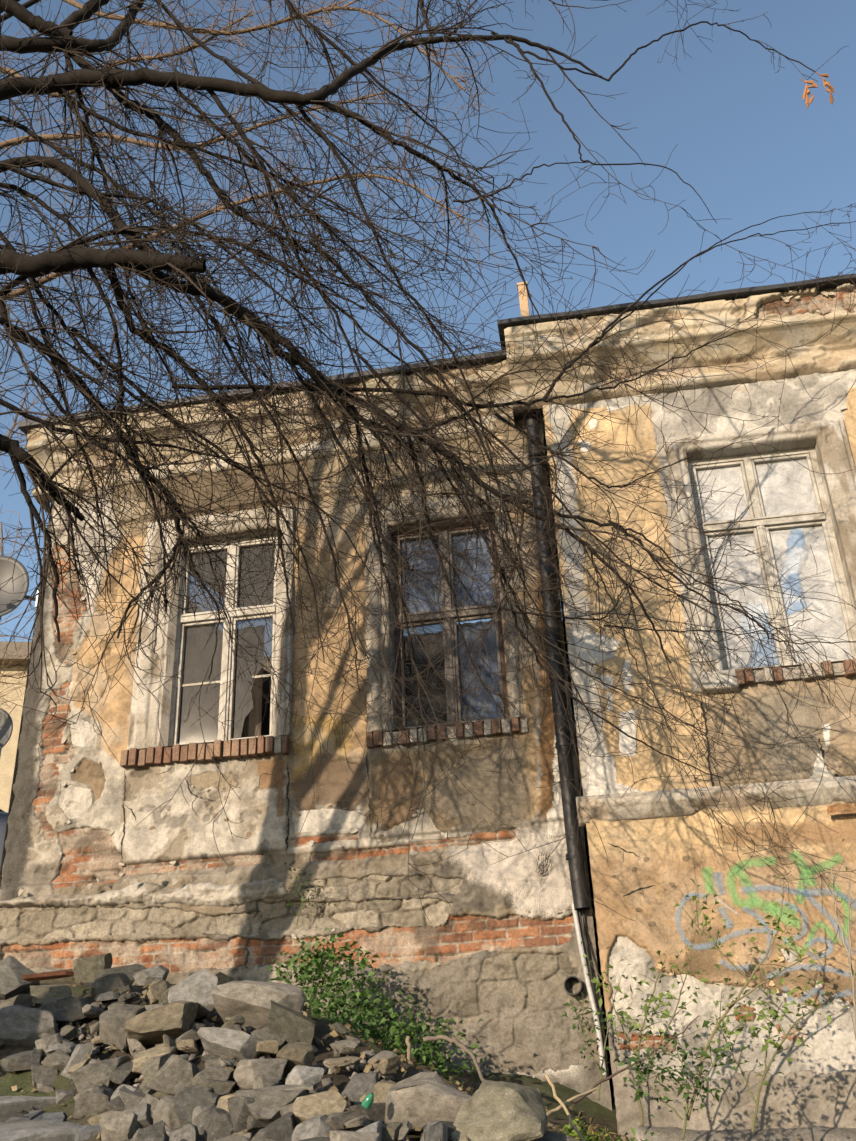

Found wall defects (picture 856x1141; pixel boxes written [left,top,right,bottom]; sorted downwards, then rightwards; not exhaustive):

flaking render [756,288,856,320]
flaking render [557,369,856,453]
flaking render [52,497,120,664]
flaking render [32,676,265,889]
peeling [568,630,645,796]
flaking render [1,915,574,973]
flaking render [607,936,856,1081]